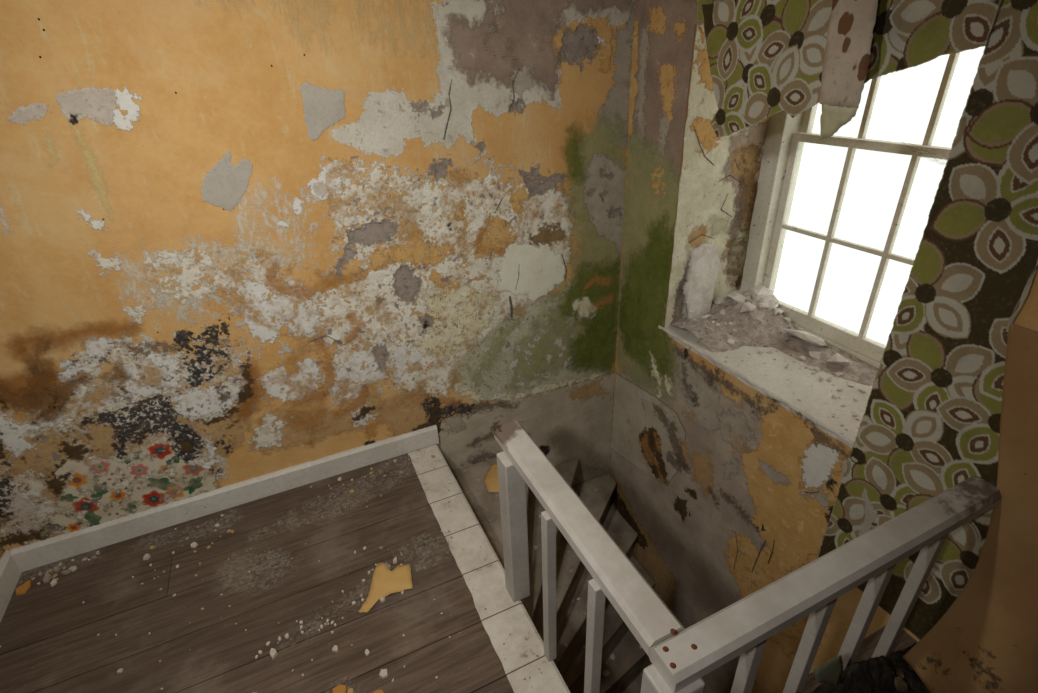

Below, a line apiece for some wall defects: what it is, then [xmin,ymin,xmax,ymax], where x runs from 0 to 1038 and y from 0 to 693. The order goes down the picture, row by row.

peeling [77,209,110,230]
peeling [87,0,769,486]
damp [0,317,267,551]
peeling [723,394,842,598]
peeling [769,614,810,658]